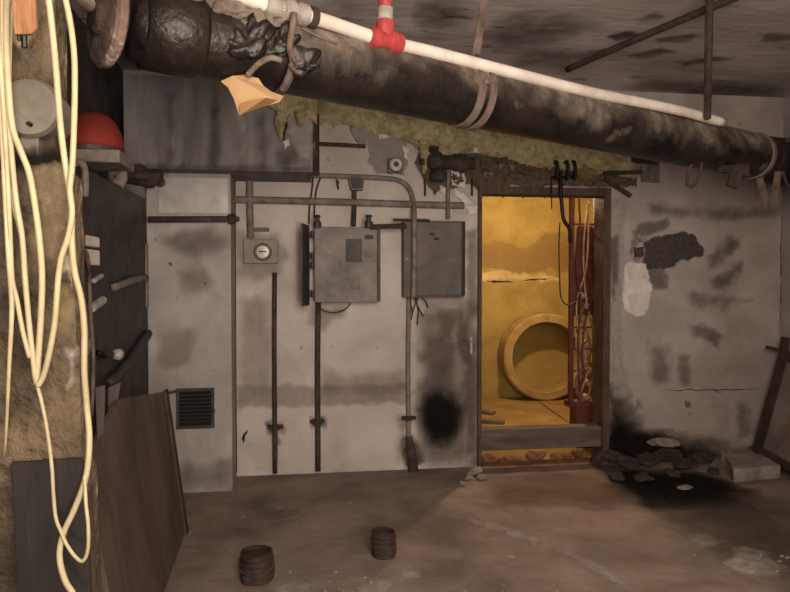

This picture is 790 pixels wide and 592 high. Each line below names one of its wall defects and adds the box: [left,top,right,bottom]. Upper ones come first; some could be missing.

spalling [368,134,637,214]
spalling [611,201,704,399]
damp [609,400,717,458]